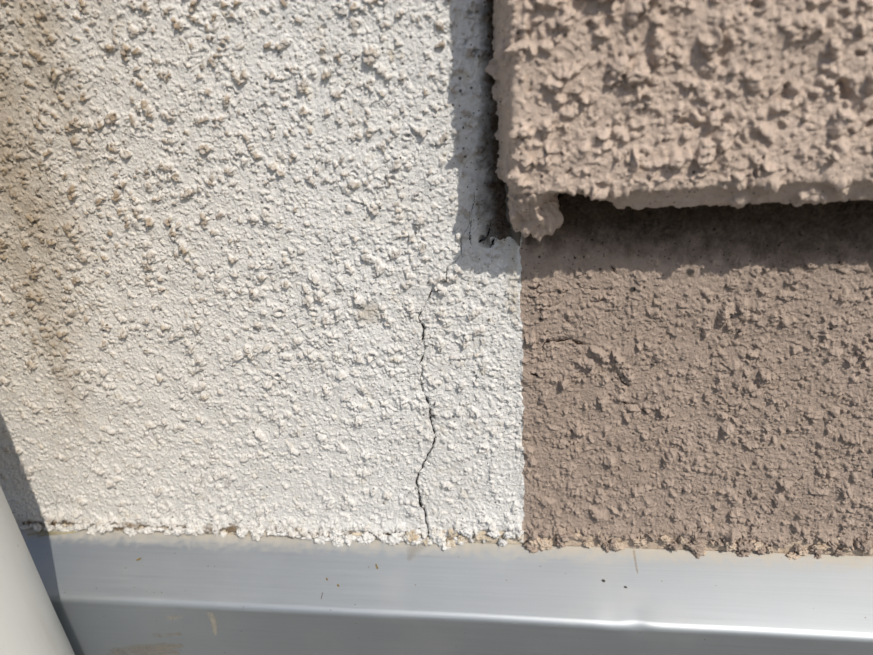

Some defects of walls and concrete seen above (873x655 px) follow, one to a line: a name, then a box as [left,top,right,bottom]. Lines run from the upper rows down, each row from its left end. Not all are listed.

crack [403,193,495,534]